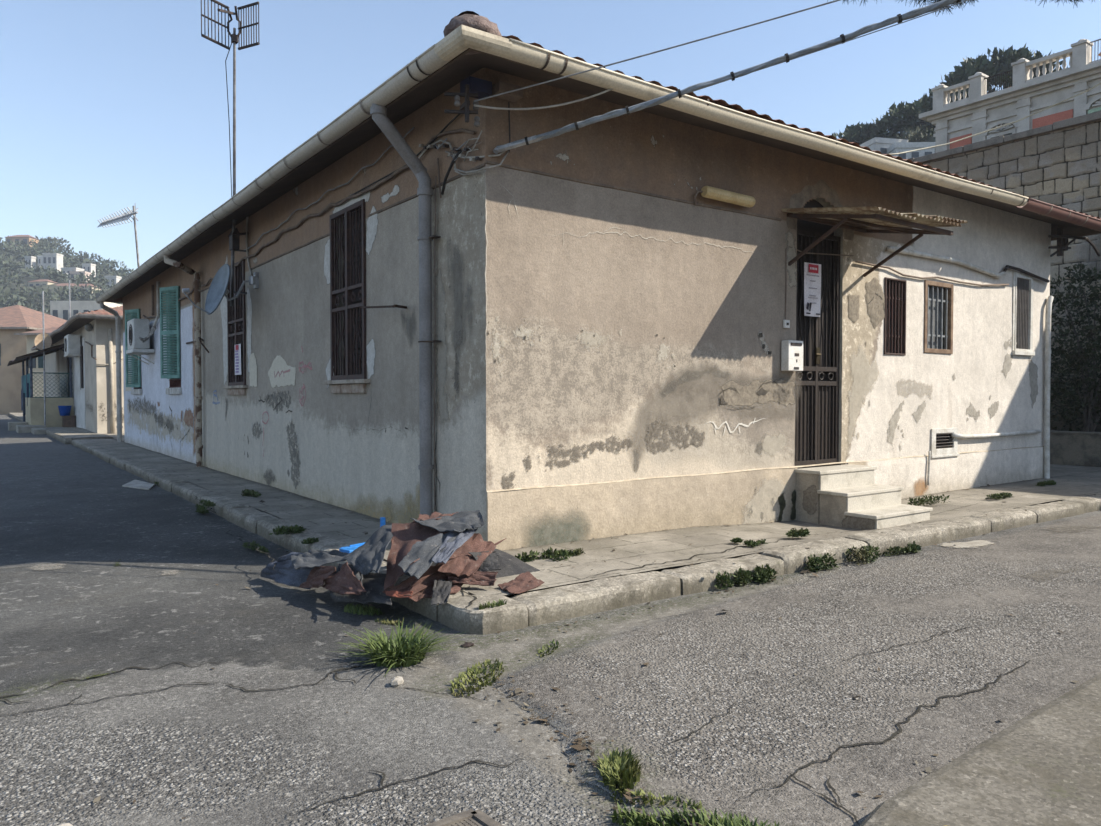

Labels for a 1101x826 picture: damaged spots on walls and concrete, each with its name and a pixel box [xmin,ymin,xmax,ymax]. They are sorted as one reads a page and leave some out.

peeling [243,391,301,489]
leakage [452,250,471,399]
flaking render [502,419,705,491]
peeling [848,342,879,449]
peeling [887,380,932,450]
peeling [966,395,999,422]
peeling [1002,337,1017,377]
peeling [1029,359,1038,408]